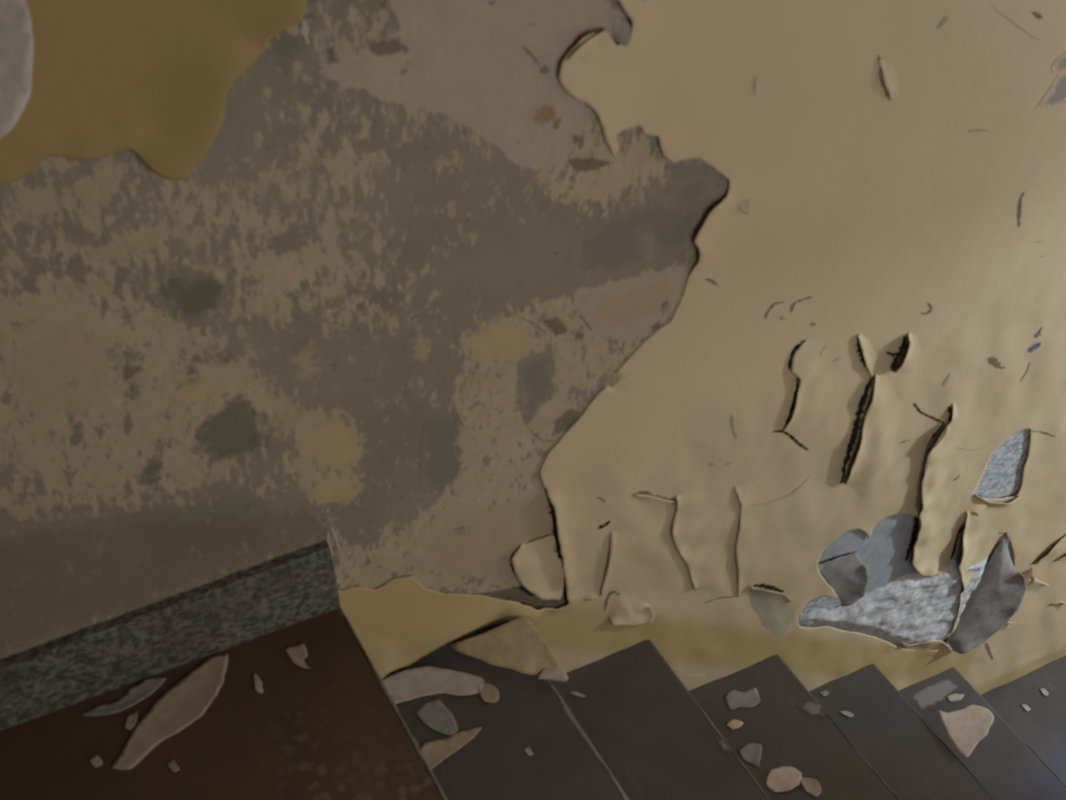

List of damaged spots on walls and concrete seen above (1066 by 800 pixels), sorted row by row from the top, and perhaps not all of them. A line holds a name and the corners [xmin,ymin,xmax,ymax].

peeling [0,0,729,600]
water stain [0,502,350,659]
peeling [601,530,655,626]
spalling [672,403,1066,654]
peeling [82,654,228,770]
peeling [253,673,263,693]
peeling [286,644,311,669]
peeling [448,616,585,697]